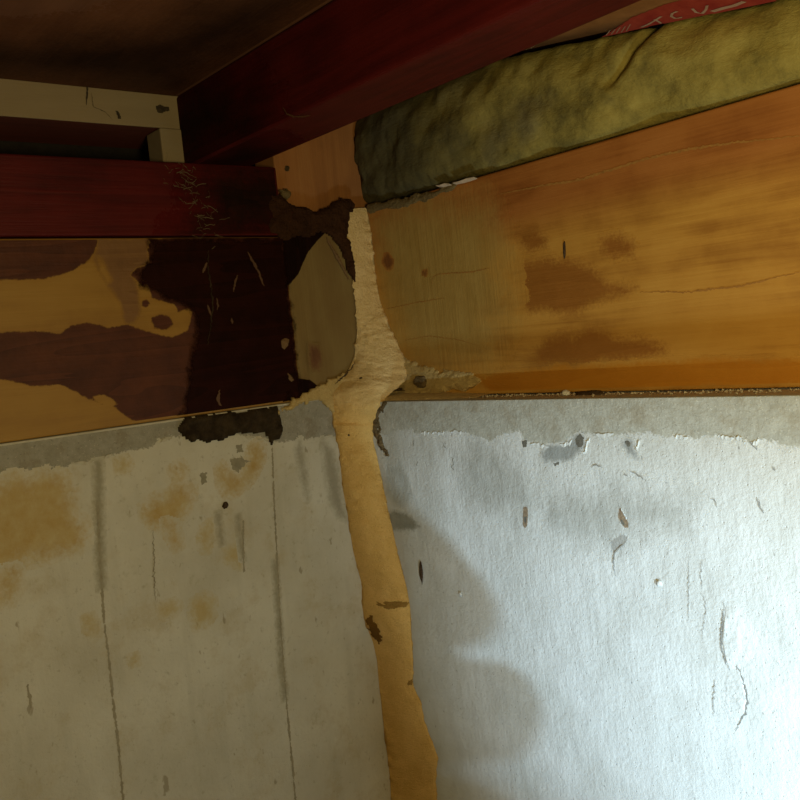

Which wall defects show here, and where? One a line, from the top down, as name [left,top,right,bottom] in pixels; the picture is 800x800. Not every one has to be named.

leakage [0,0,327,421]
leakage [367,178,800,391]
peeling [0,420,185,473]
peeling [230,400,336,473]
peeling [372,389,800,466]